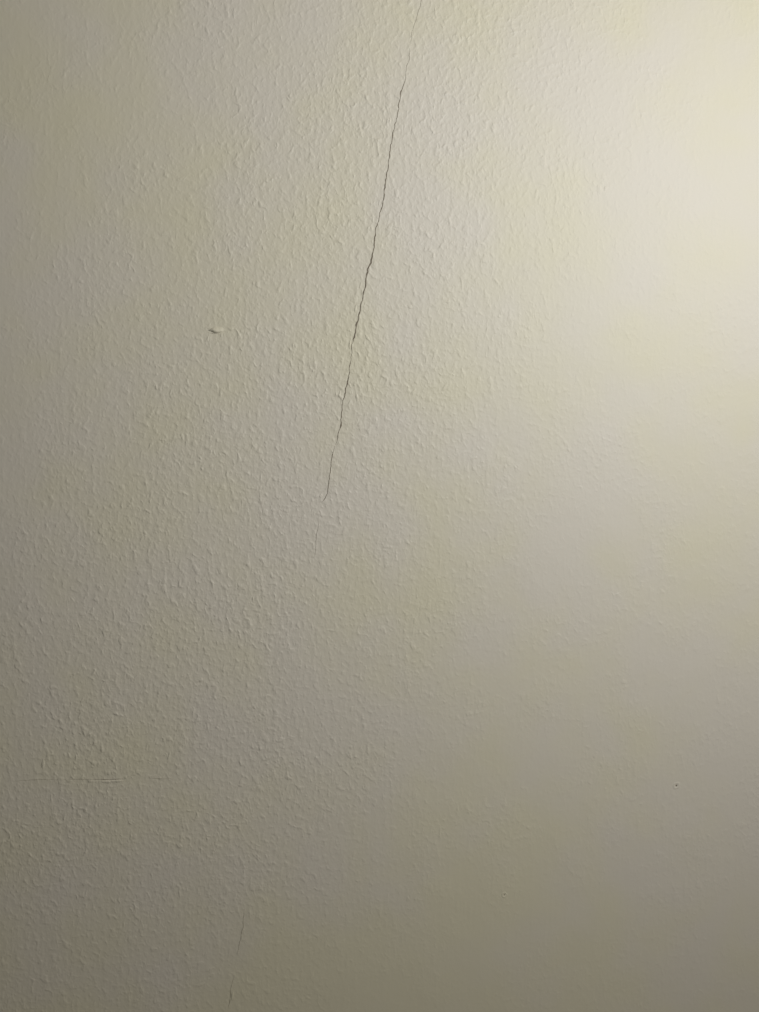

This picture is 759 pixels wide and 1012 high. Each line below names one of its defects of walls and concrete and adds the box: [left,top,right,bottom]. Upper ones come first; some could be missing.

crack [319,4,421,501]